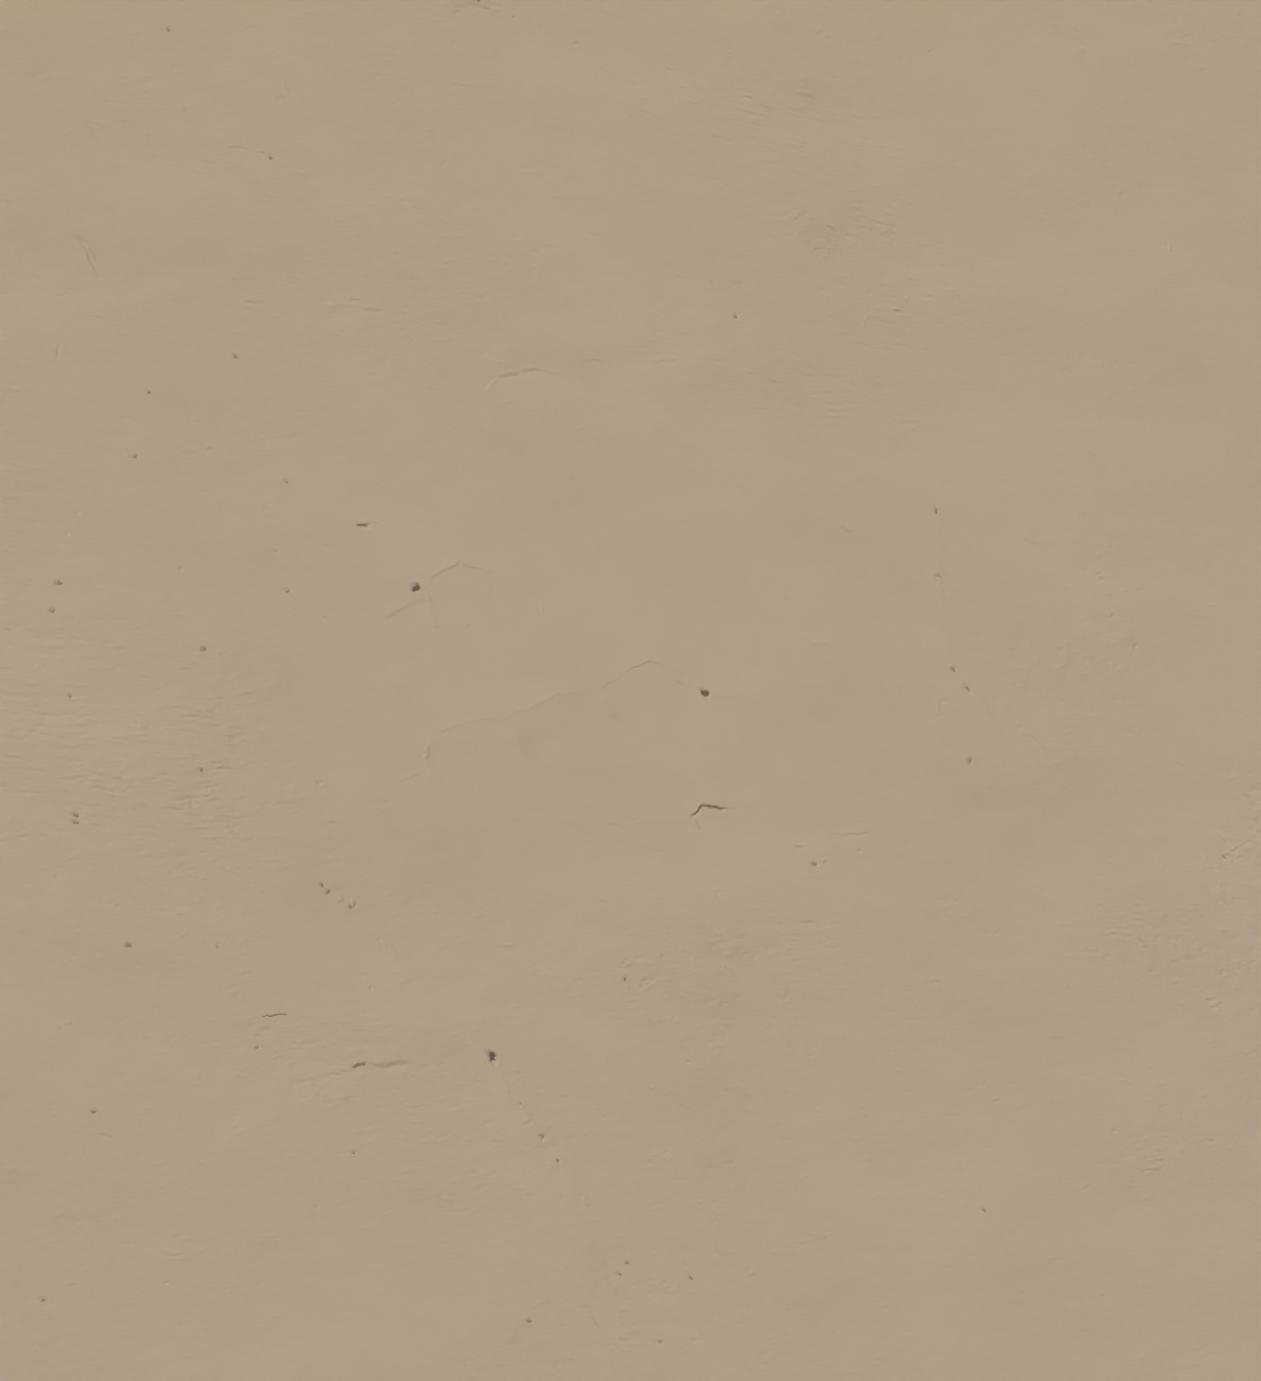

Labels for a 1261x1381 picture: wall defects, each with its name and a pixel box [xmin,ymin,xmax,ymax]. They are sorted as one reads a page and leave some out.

crack [692,782,815,834]